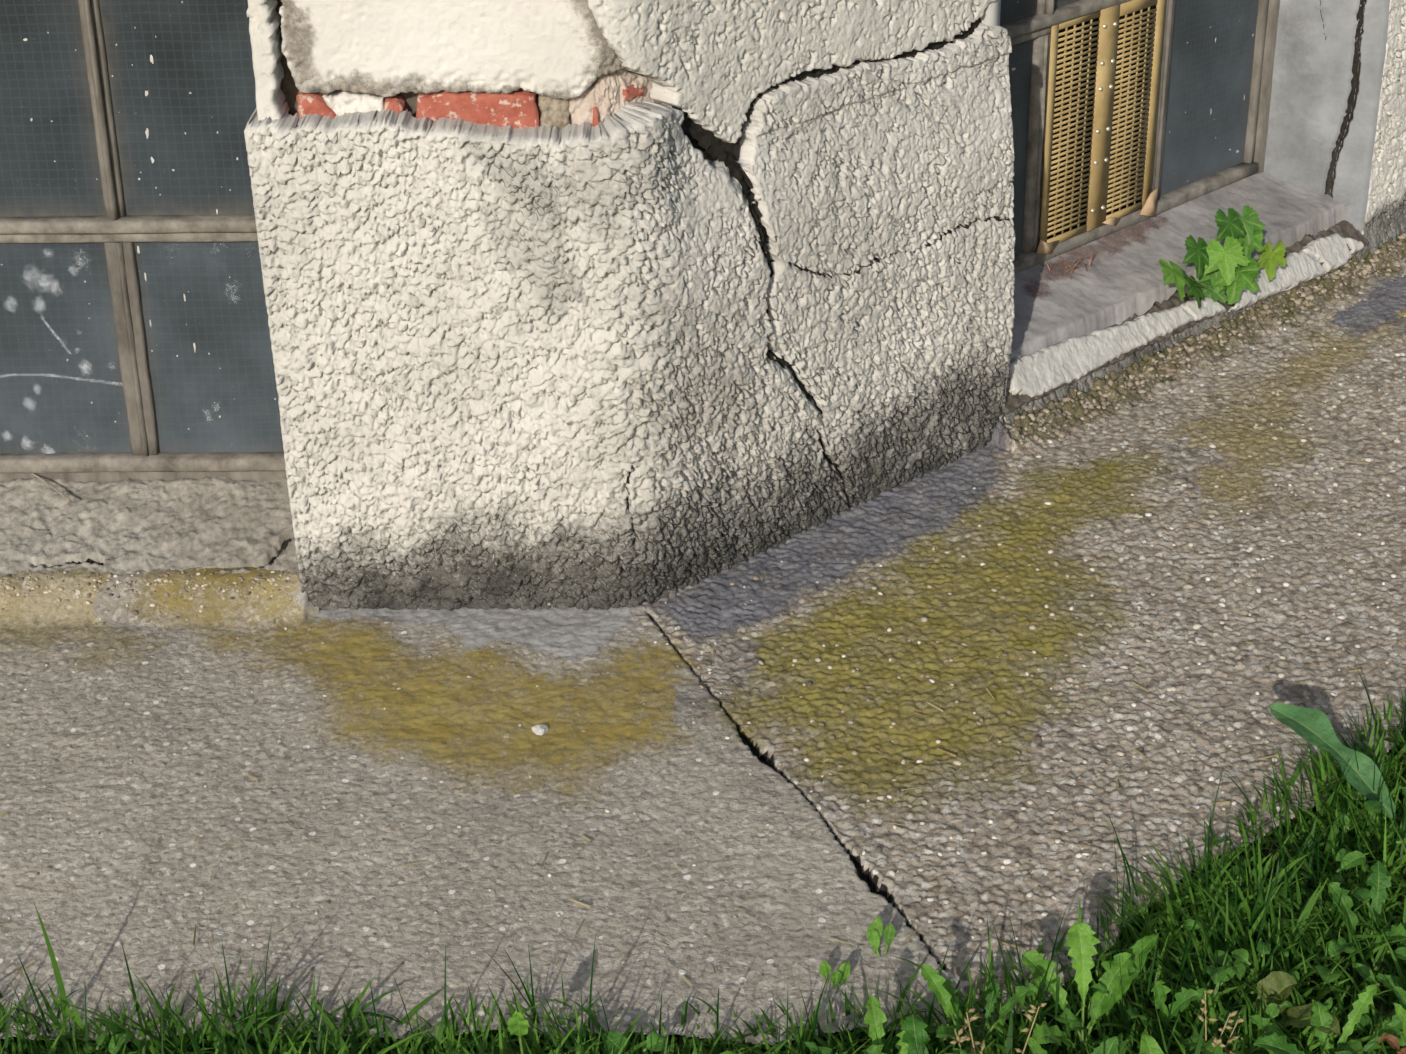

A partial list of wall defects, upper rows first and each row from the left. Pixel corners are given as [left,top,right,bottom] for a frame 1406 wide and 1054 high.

flaking render [279,0,667,130]
crack [672,18,1011,506]
leakage [296,199,1406,659]
crack [1320,0,1367,198]
crack [648,614,945,970]